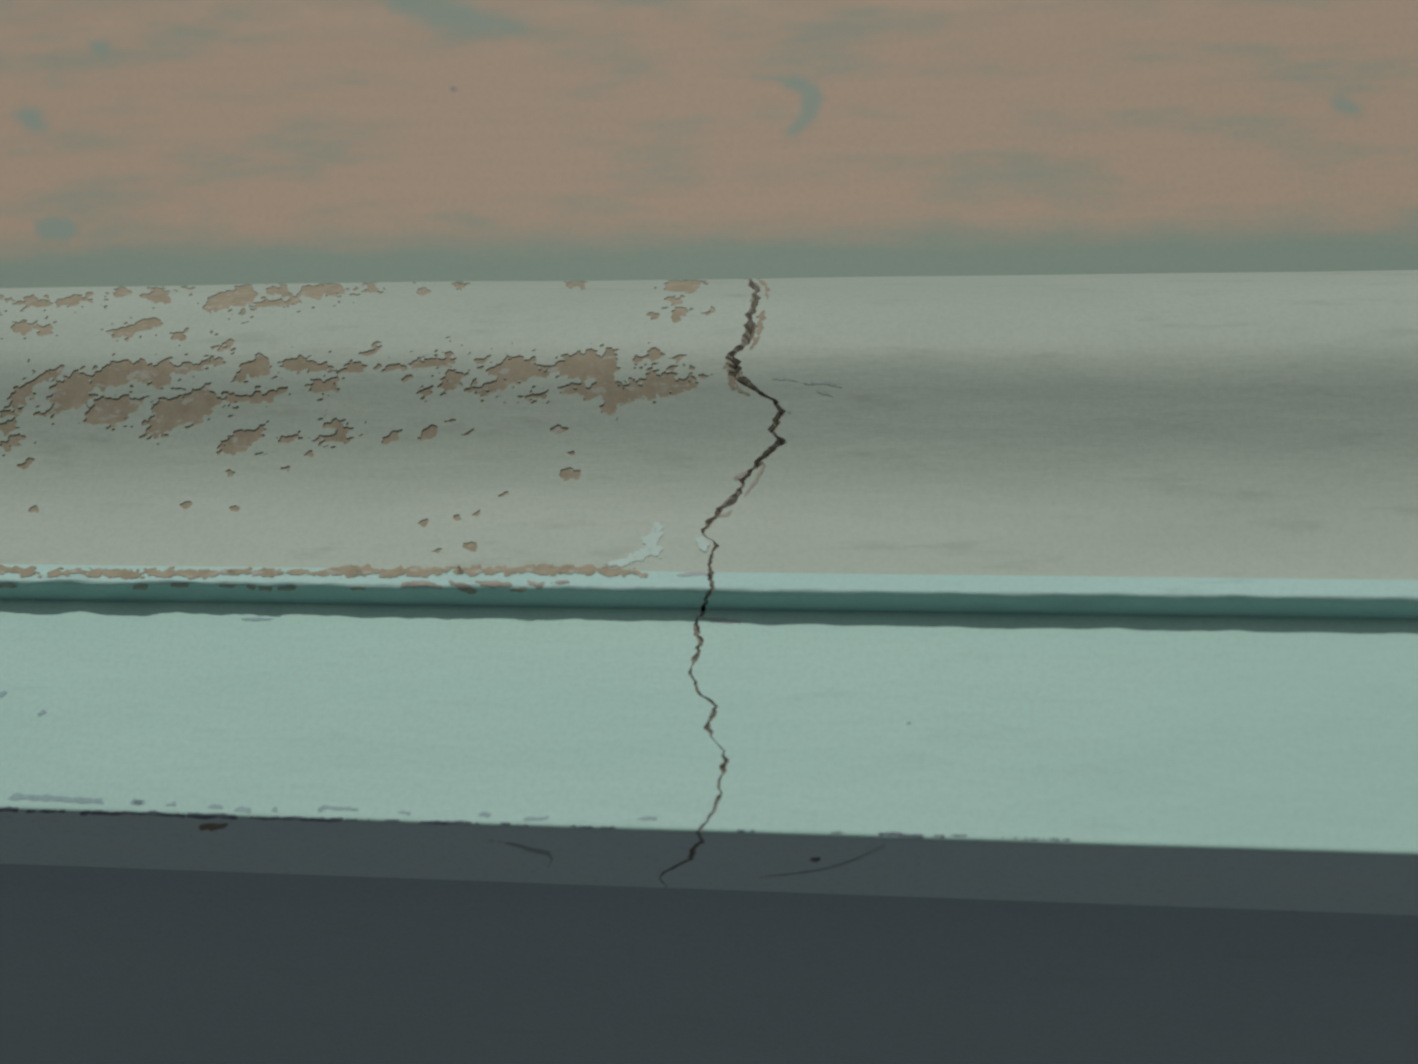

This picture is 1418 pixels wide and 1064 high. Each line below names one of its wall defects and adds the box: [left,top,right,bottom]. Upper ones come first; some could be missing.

peeling [0,281,715,481]
peeling [0,542,648,594]
crack [659,278,843,887]